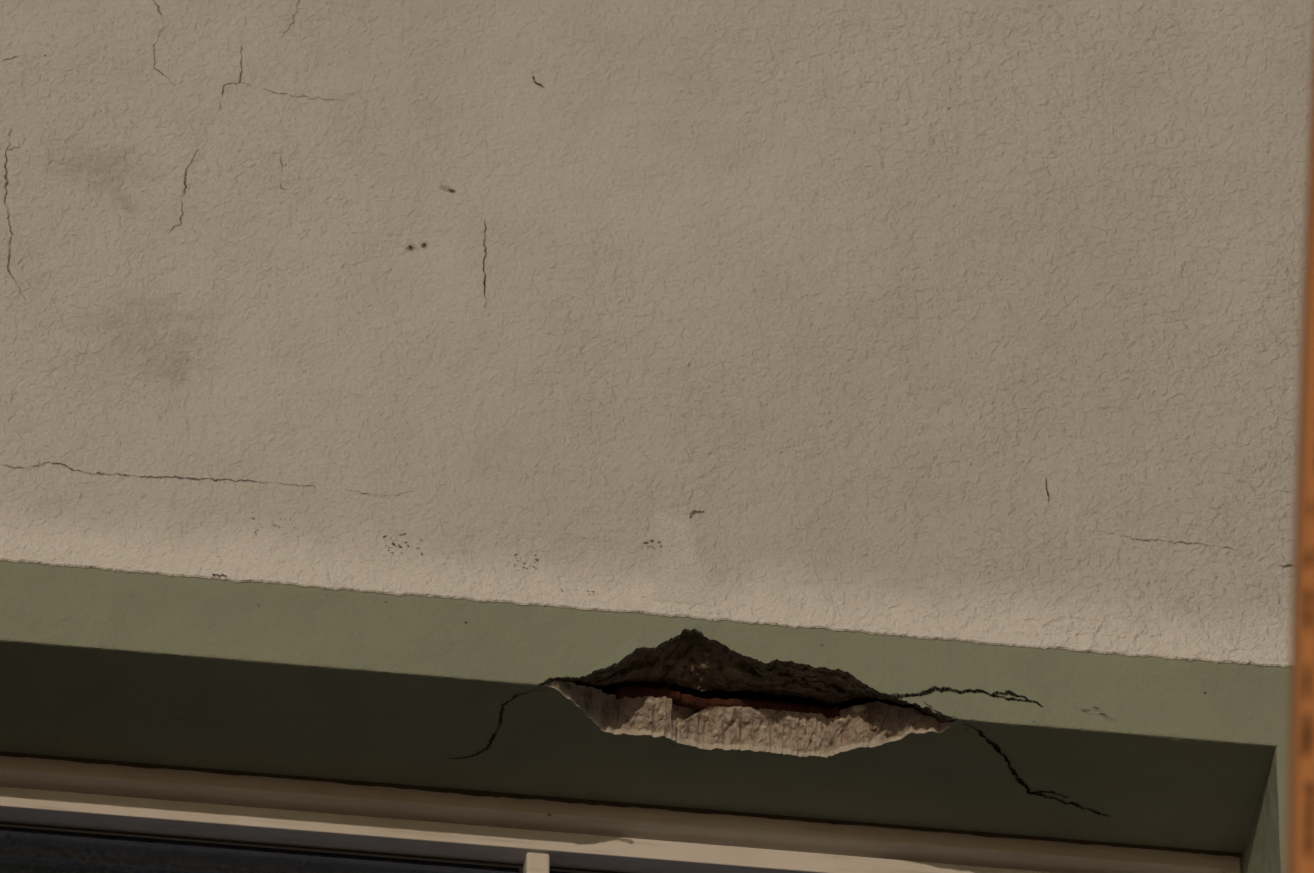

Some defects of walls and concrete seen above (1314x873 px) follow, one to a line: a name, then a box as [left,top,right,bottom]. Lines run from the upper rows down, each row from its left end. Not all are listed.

crack [4,129,27,301]
crack [171,149,198,230]
crack [45,461,255,482]
crack [448,676,597,759]
spalling [541,630,957,758]
crack [876,686,1110,817]